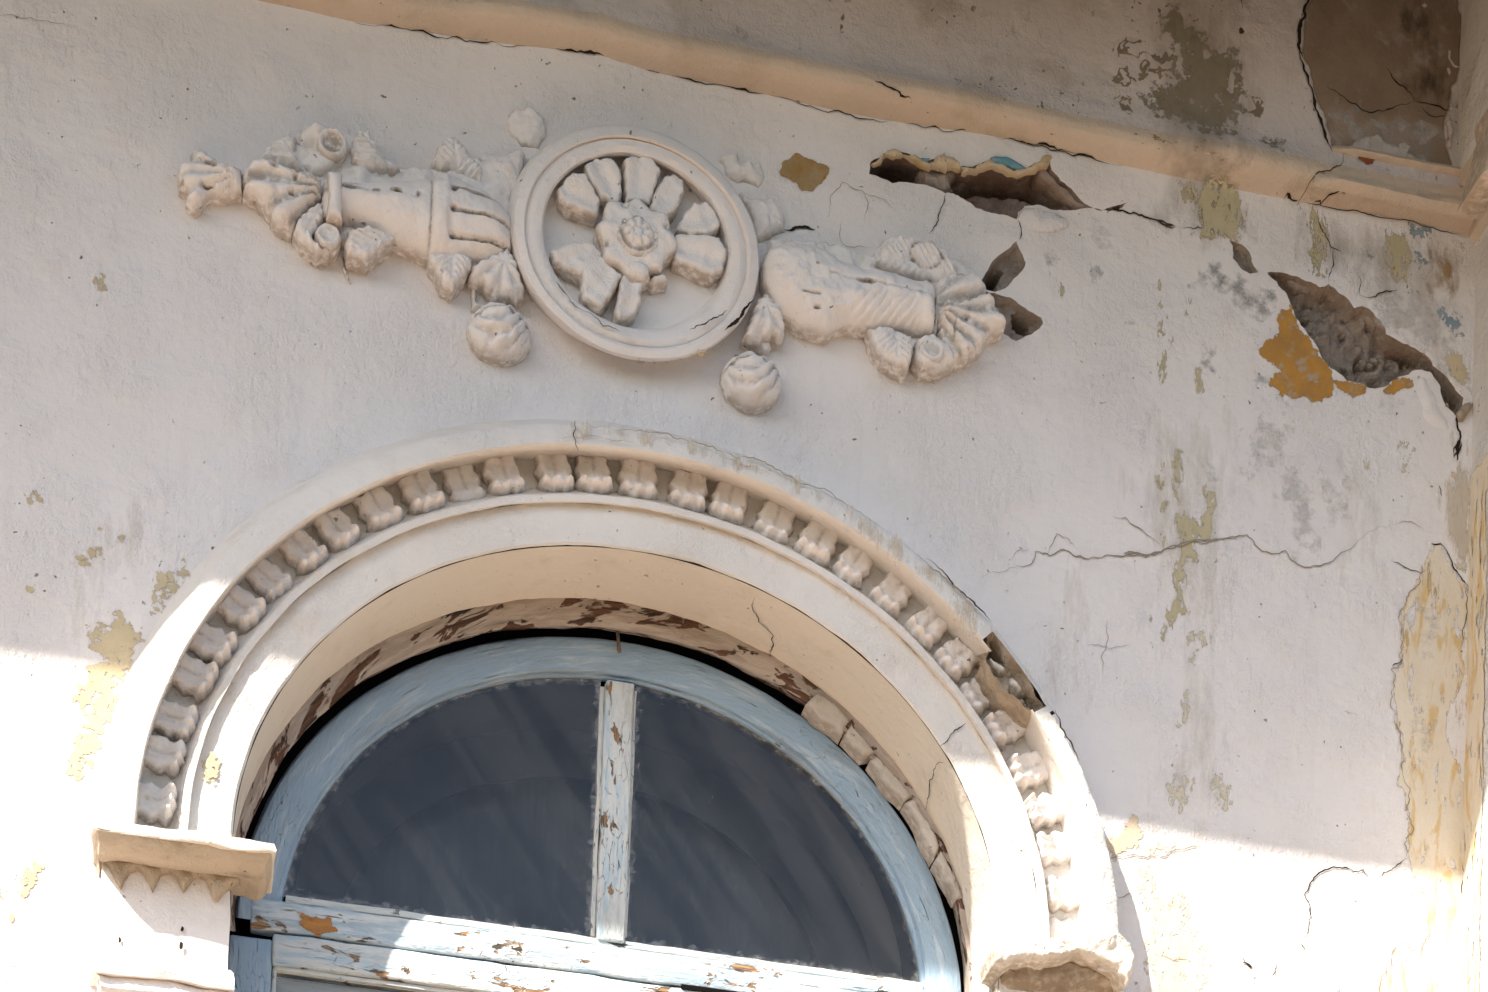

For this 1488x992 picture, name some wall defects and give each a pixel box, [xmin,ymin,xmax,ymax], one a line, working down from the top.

water stain [1113,4,1264,139]
peeling [779,153,829,191]
spalling [869,149,1126,219]
water stain [1177,169,1247,242]
crack [1285,0,1464,298]
spalling [982,241,1043,341]
spalling [1230,241,1472,422]
crack [559,421,1468,639]
peeling [64,558,190,783]
crack [1055,711,1080,761]
peeling [1378,543,1469,992]
crack [1243,858,1406,979]